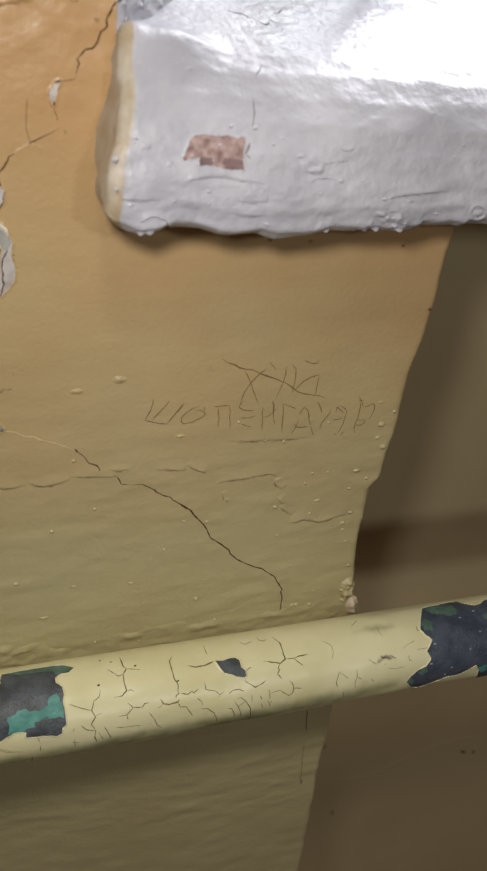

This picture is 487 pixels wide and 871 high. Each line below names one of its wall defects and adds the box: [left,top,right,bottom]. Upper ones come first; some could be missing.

crack [64,0,121,81]
crack [0,97,66,172]
spalling [46,77,65,120]
peeling [181,132,247,172]
peeling [0,180,18,299]
crack [5,431,283,614]